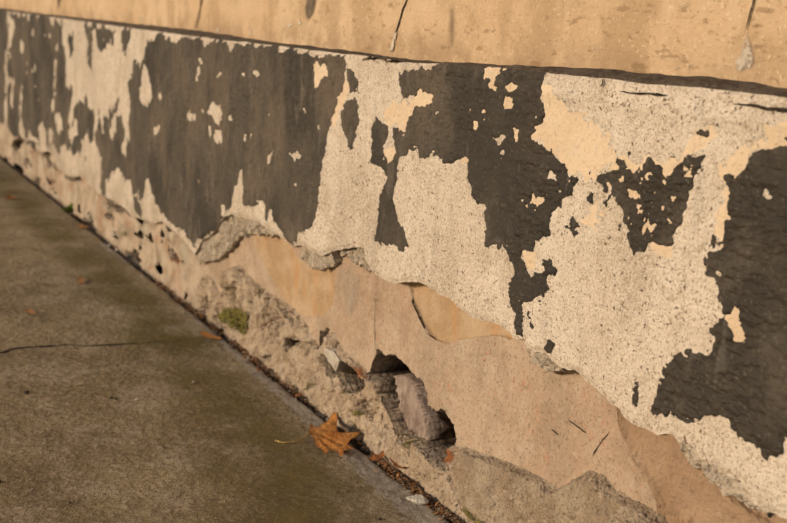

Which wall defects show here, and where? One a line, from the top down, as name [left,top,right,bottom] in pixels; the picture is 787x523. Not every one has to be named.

crack [0,337,206,353]
flaking render [0,11,438,455]
crack [408,288,436,340]
flaking render [361,67,787,523]